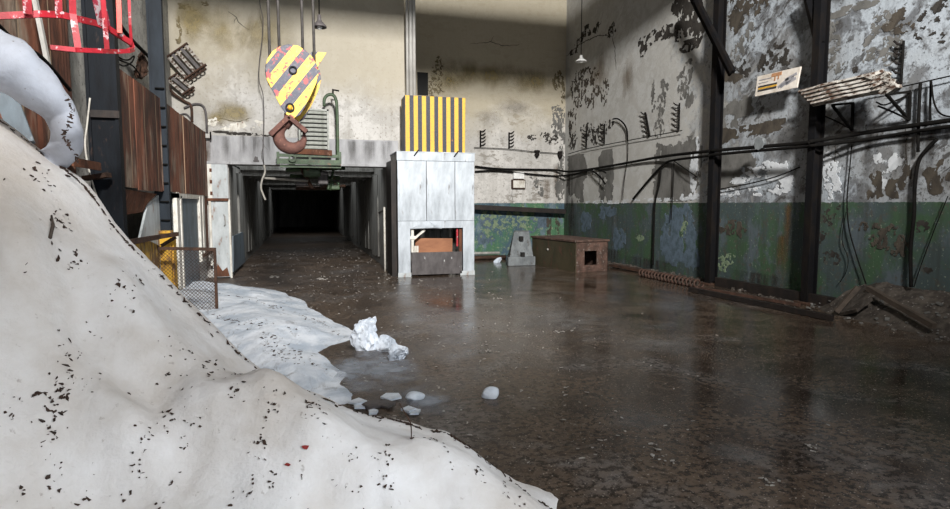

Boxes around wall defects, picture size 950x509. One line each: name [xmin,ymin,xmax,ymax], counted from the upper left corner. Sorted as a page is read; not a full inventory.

peeling [724,0,791,84]
peeling [828,0,948,74]
flaking render [527,0,705,269]
flaking render [720,95,793,197]
flaking render [867,153,950,200]